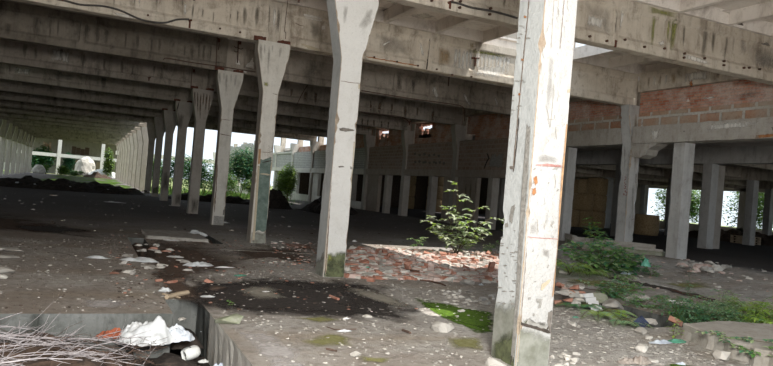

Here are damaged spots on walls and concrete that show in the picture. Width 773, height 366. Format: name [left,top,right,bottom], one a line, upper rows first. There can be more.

damp [652,8,684,45]
spalling [491,124,567,366]